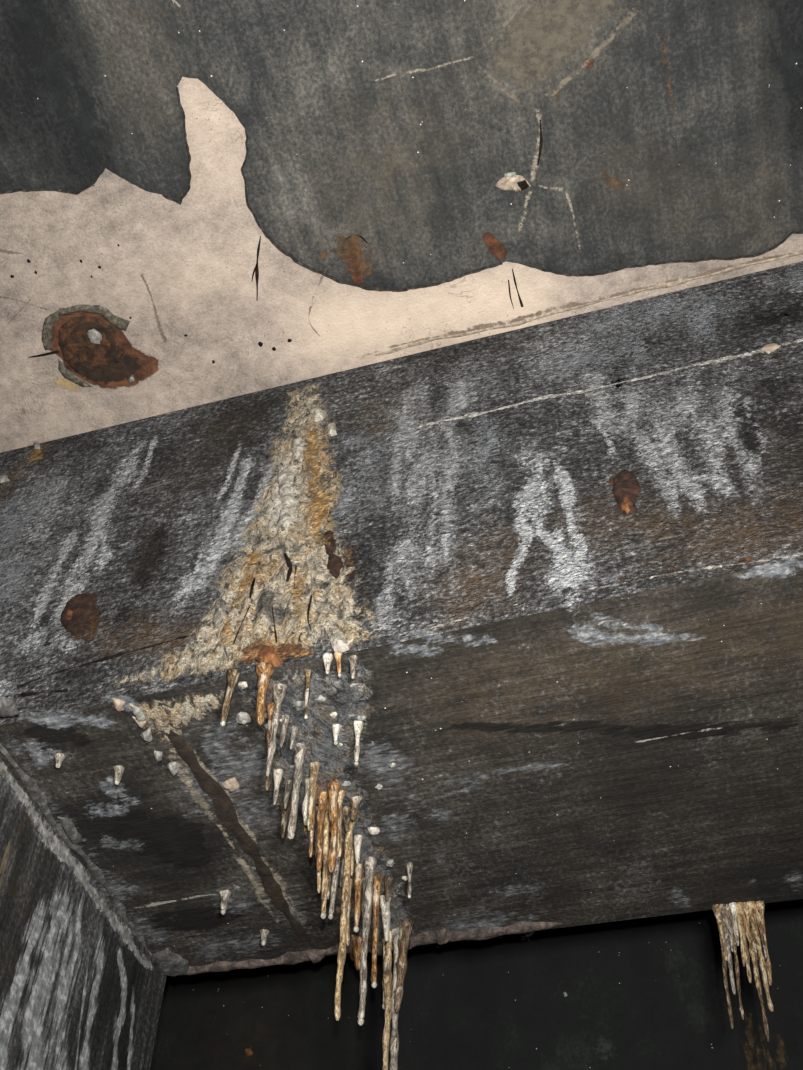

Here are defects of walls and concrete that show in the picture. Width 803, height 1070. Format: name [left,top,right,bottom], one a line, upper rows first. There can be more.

crack [375,57,470,81]
corrosion [320,234,372,285]
peeling [0,77,803,453]
corrosion [483,233,507,260]
crack [519,109,580,247]
crack [419,338,803,428]
water stain [548,288,803,521]
efflorescence [170,447,279,616]
water stain [329,371,596,633]
corrosion [608,470,641,516]
corrosion [58,590,101,641]
water stain [0,661,564,1070]